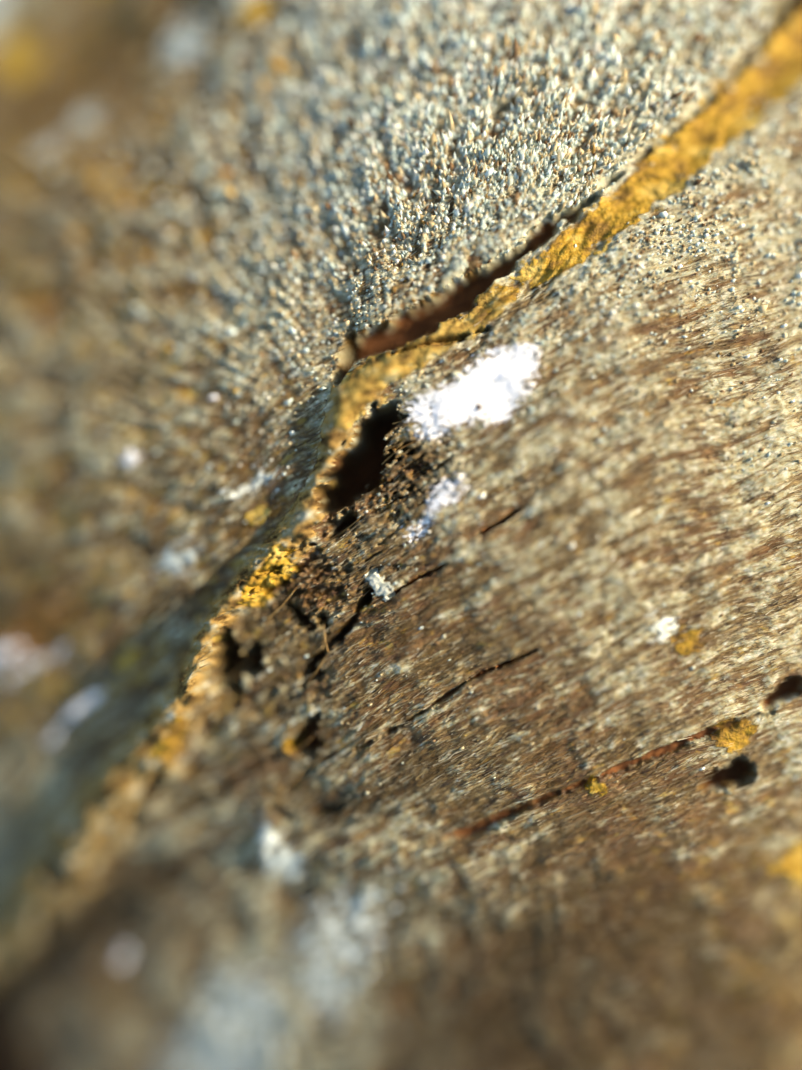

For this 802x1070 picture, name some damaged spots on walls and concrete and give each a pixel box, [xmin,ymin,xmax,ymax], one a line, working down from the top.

crack [757,0,802,53]
crack [339,206,583,381]
crack [327,411,401,535]
crack [478,511,517,534]
crack [226,633,267,688]
crack [291,564,445,680]
crack [388,655,523,732]
crack [226,712,329,787]
crack [429,723,729,842]